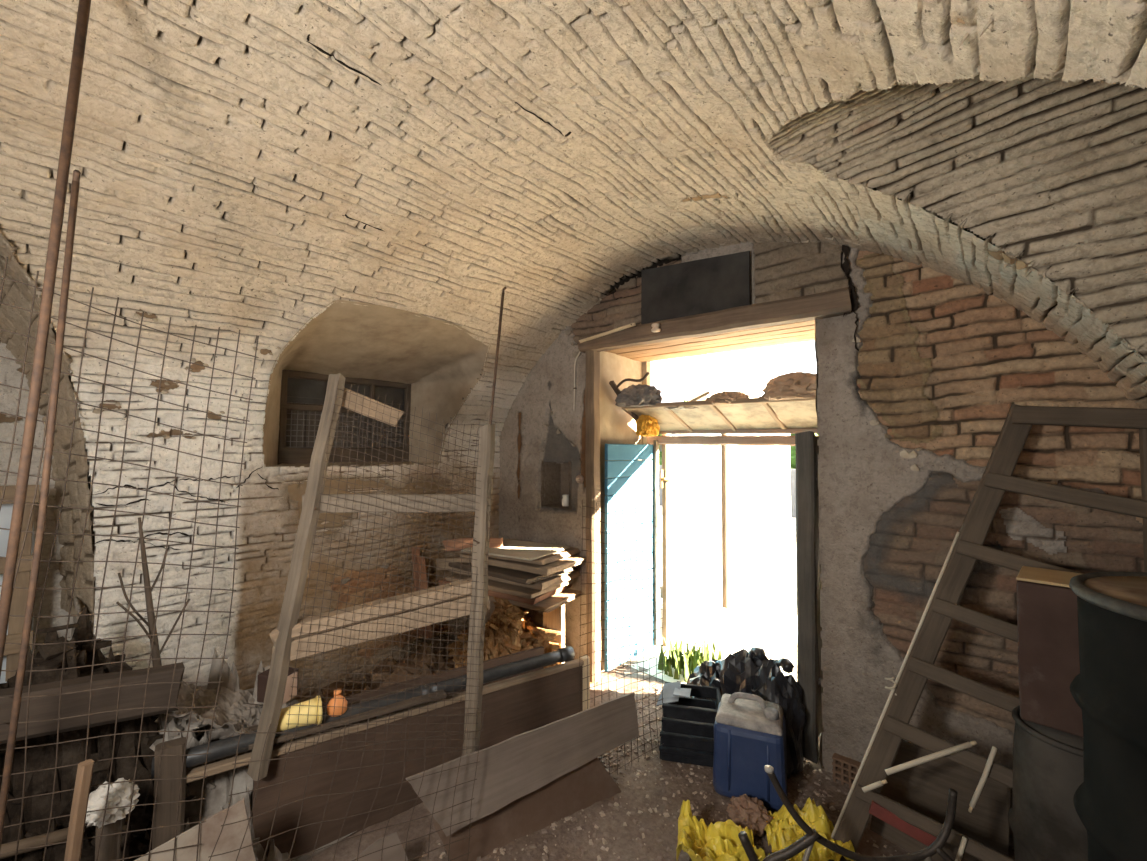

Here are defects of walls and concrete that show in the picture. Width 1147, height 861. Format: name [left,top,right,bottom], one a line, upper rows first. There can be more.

crack [842,245,859,351]